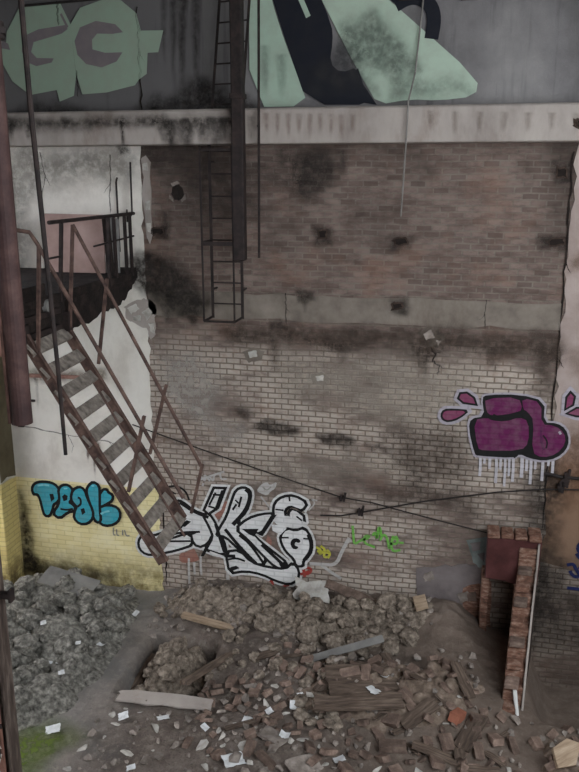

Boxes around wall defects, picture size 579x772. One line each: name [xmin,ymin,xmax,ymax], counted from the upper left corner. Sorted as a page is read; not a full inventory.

flaking render [124,298,157,339]
damp [226,322,559,359]